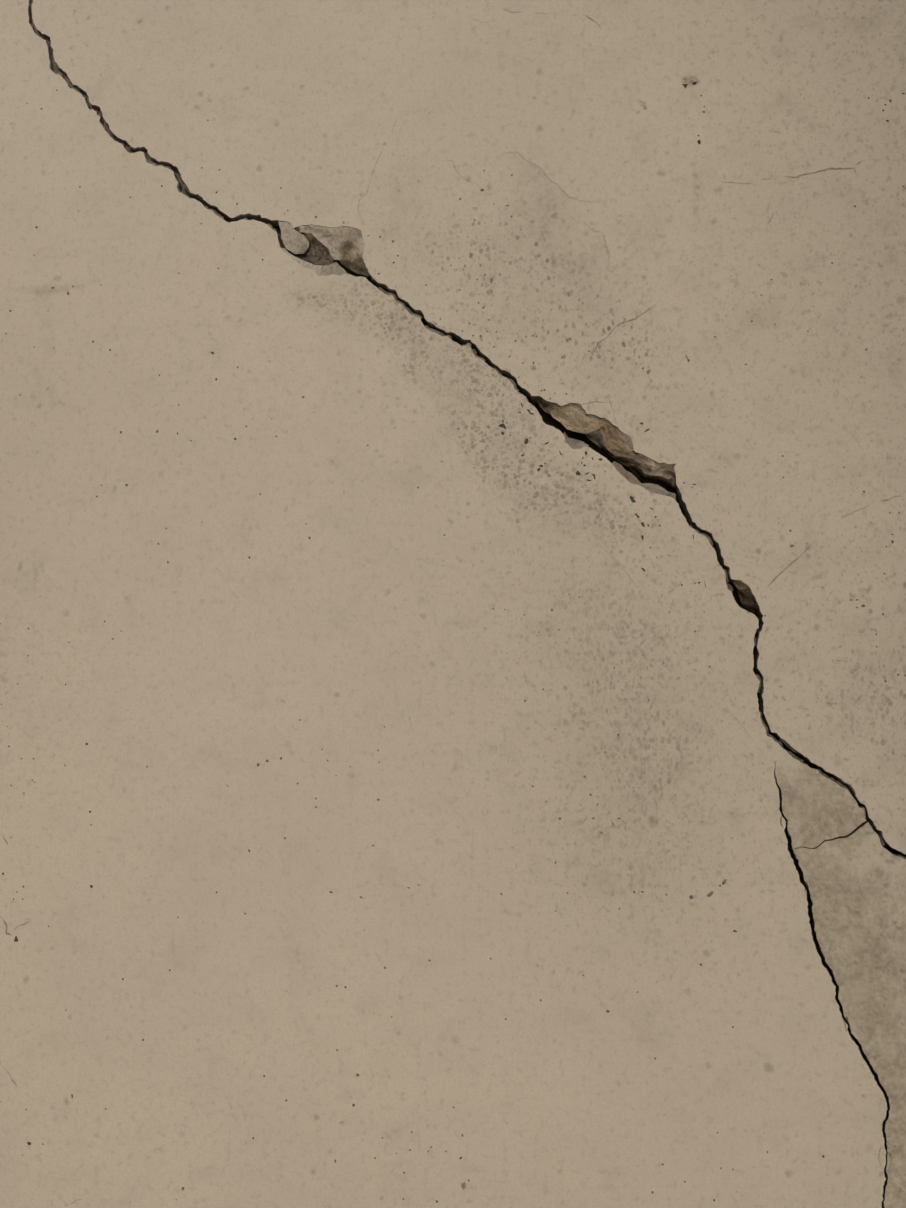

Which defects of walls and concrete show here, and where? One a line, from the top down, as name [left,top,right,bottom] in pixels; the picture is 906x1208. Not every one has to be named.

spalling [278,221,370,277]
crack [28,0,643,483]
spalling [519,397,698,558]
spalling [726,578,762,619]
crack [633,449,906,1208]